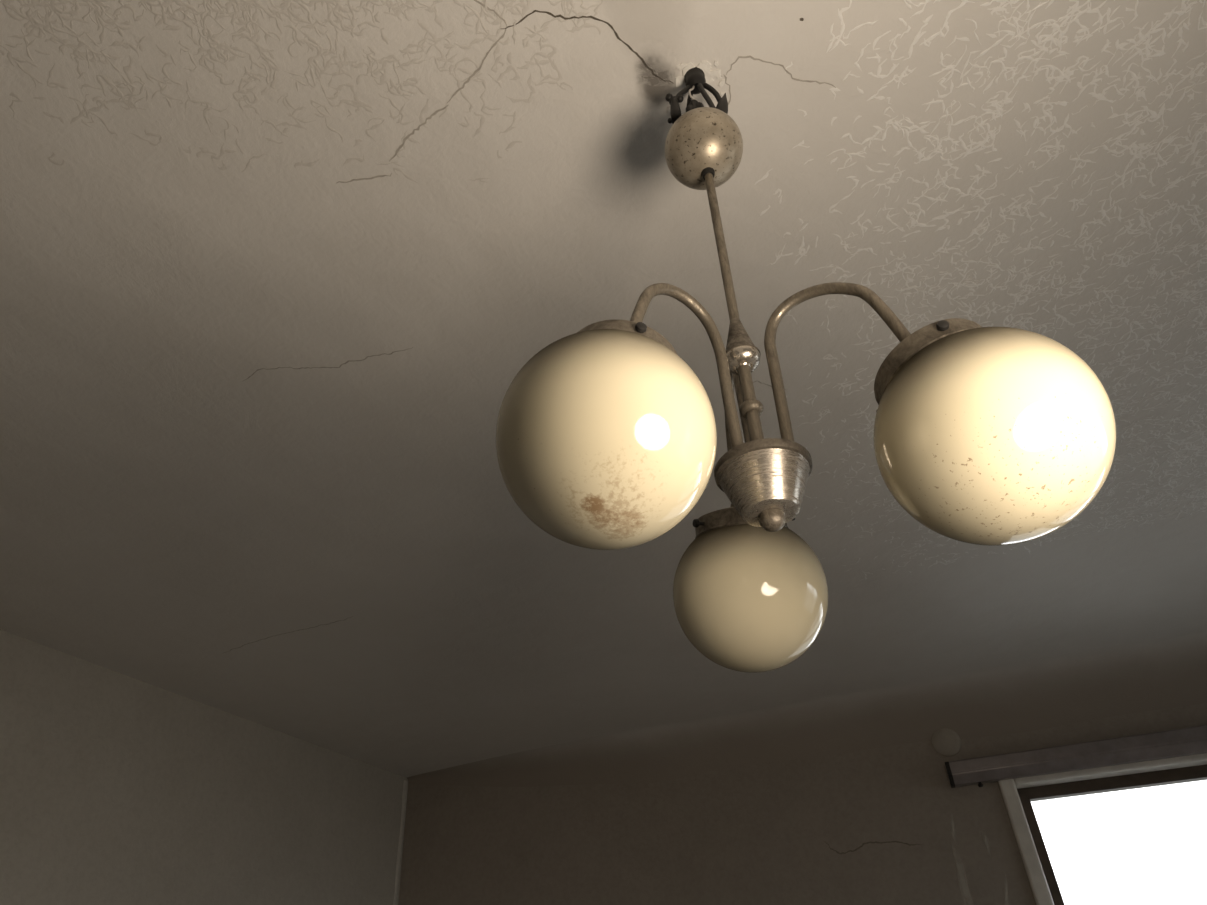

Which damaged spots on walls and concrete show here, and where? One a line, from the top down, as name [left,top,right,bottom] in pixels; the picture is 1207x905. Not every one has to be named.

crack [337,0,674,183]
crack [721,56,836,105]
crack [243,347,413,381]